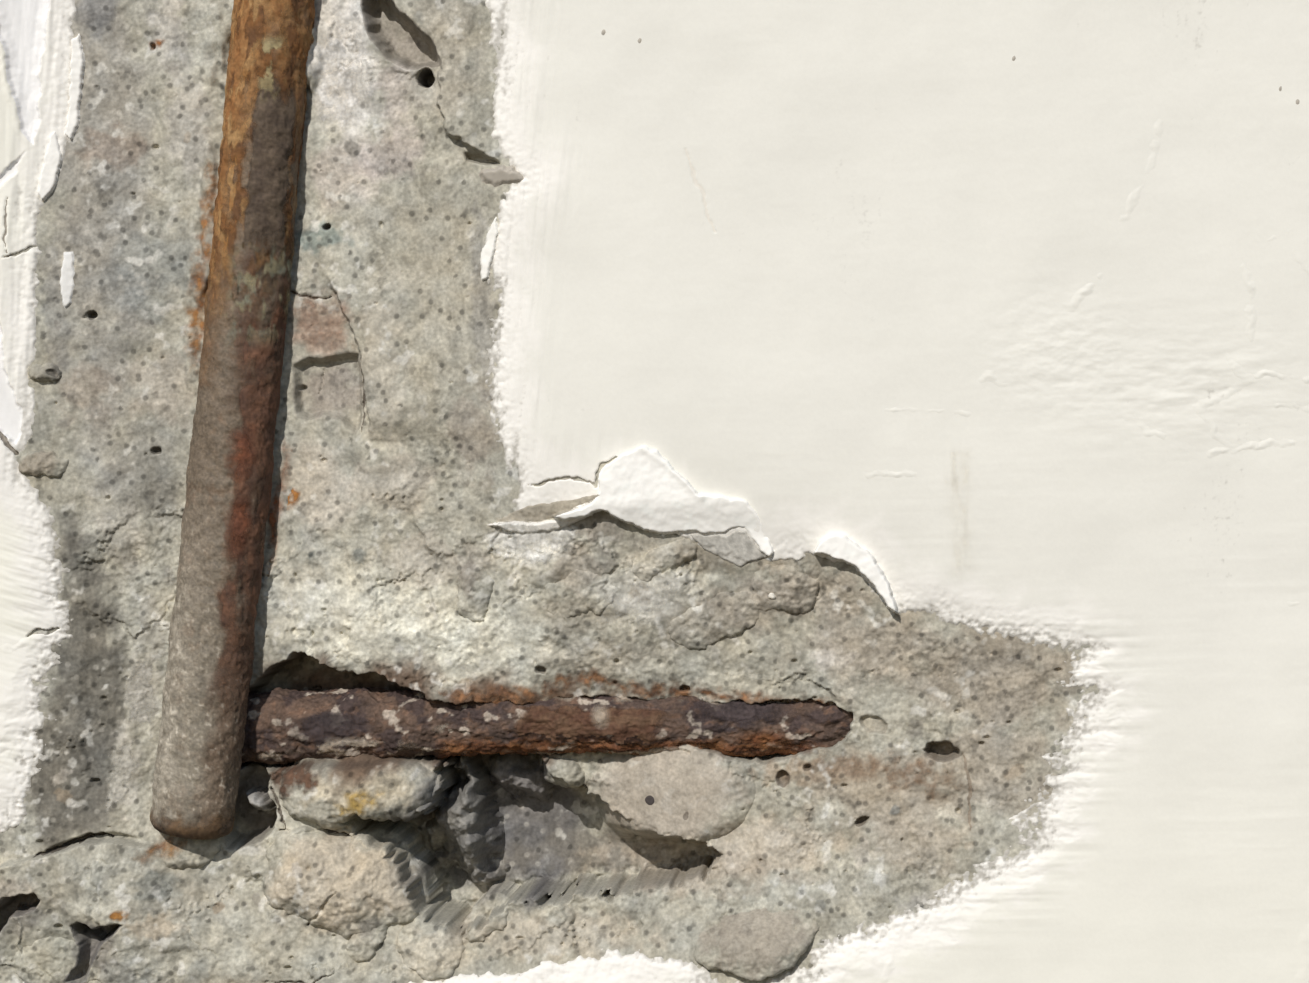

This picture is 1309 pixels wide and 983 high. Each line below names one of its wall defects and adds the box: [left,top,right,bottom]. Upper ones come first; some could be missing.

corrosion [188,0,315,354]
spalling [0,0,472,983]
corrosion [217,257,299,677]
spalling [249,0,1099,983]
corrosion [271,761,318,797]
corrosion [454,671,781,704]
corrosion [445,734,799,757]